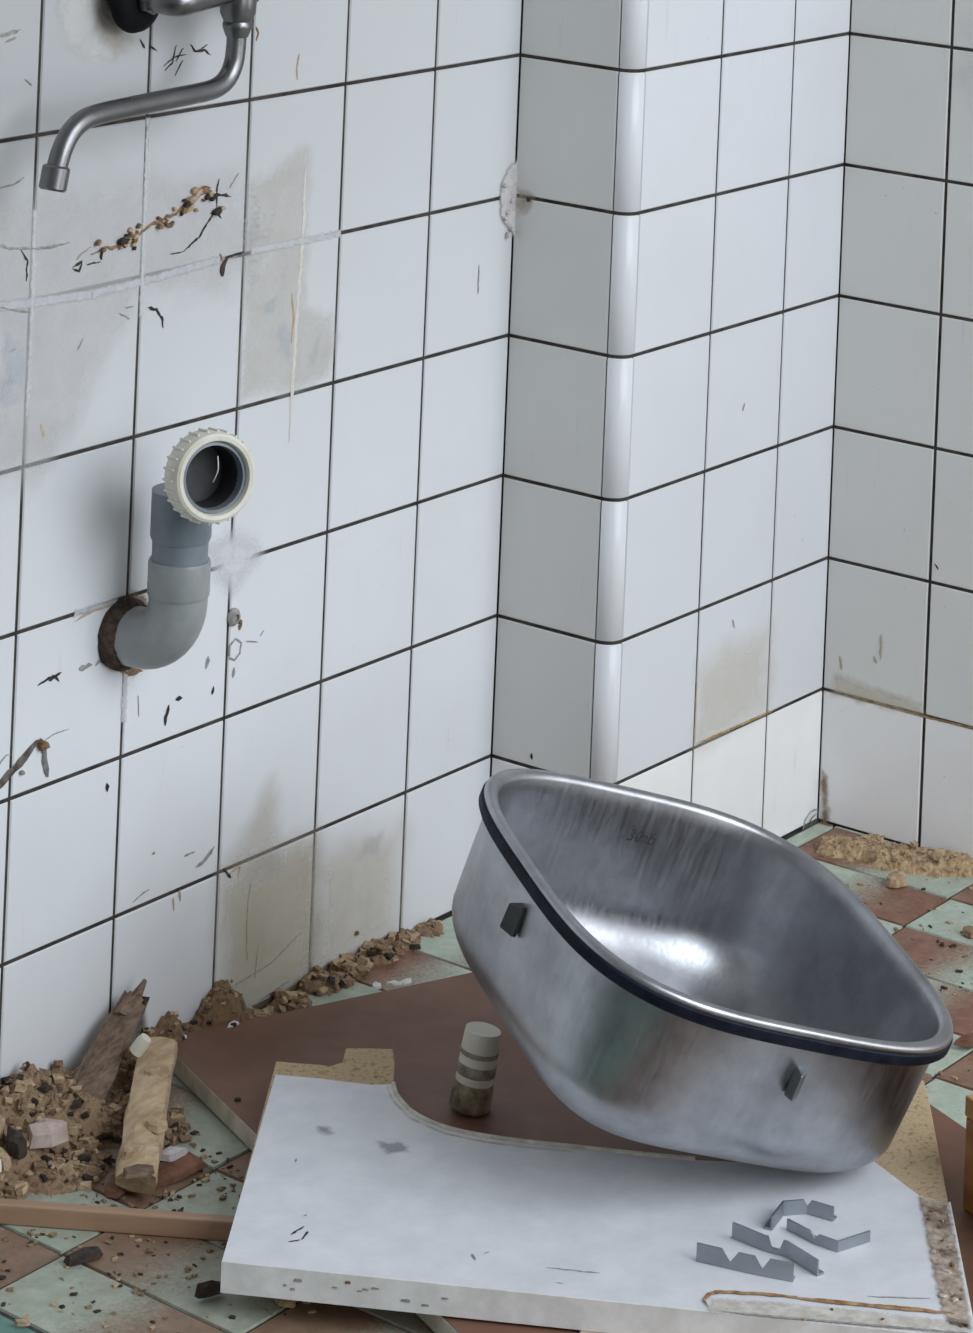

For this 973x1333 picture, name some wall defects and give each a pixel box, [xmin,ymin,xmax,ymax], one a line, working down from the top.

spalling [500,162,531,238]